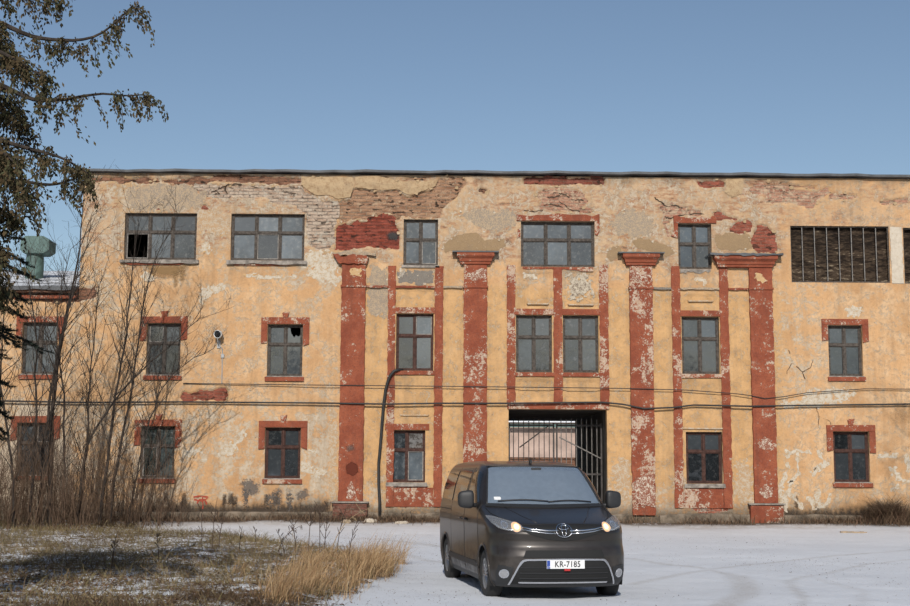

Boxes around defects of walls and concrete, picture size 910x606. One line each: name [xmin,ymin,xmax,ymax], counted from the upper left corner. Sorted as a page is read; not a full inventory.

flaking render [92,174,466,287]